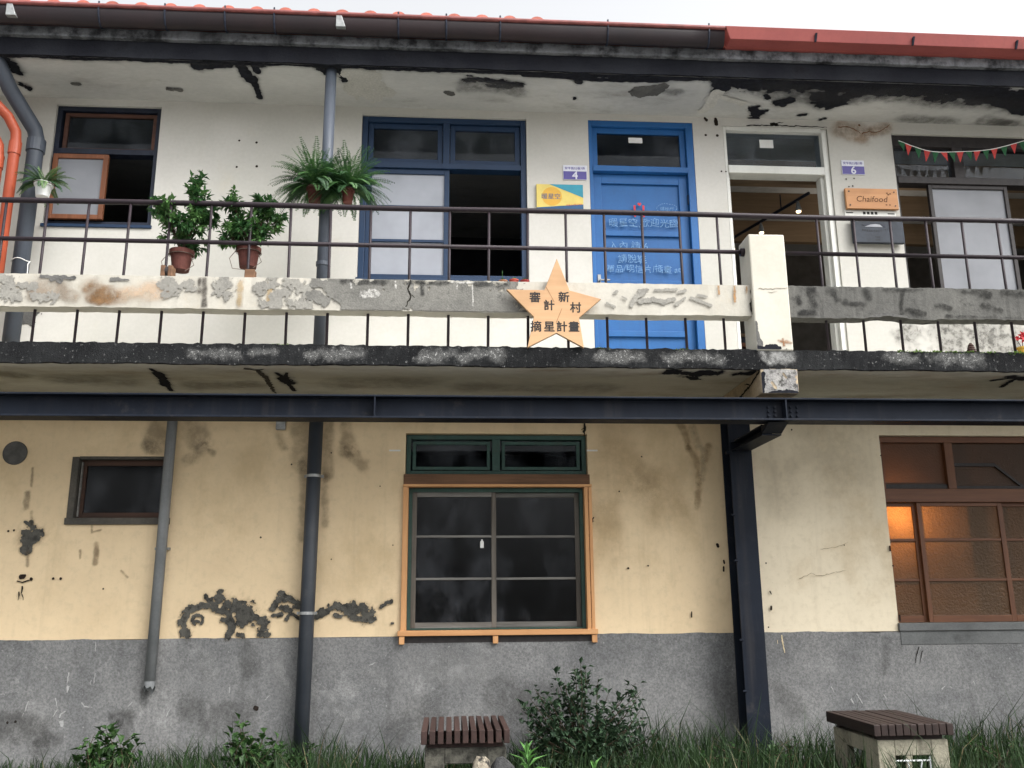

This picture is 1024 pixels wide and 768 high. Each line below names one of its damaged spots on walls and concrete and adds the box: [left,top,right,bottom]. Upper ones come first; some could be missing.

spalling [190,61,266,99]
spalling [628,83,670,98]
spalling [763,94,807,116]
peeling [0,273,76,326]
rust [83,283,121,304]
peeling [156,276,198,299]
peeling [252,277,527,312]
spalling [149,368,173,391]
spalling [275,372,296,391]
spalling [7,520,45,556]
peeling [177,589,300,641]
peeling [314,599,393,625]